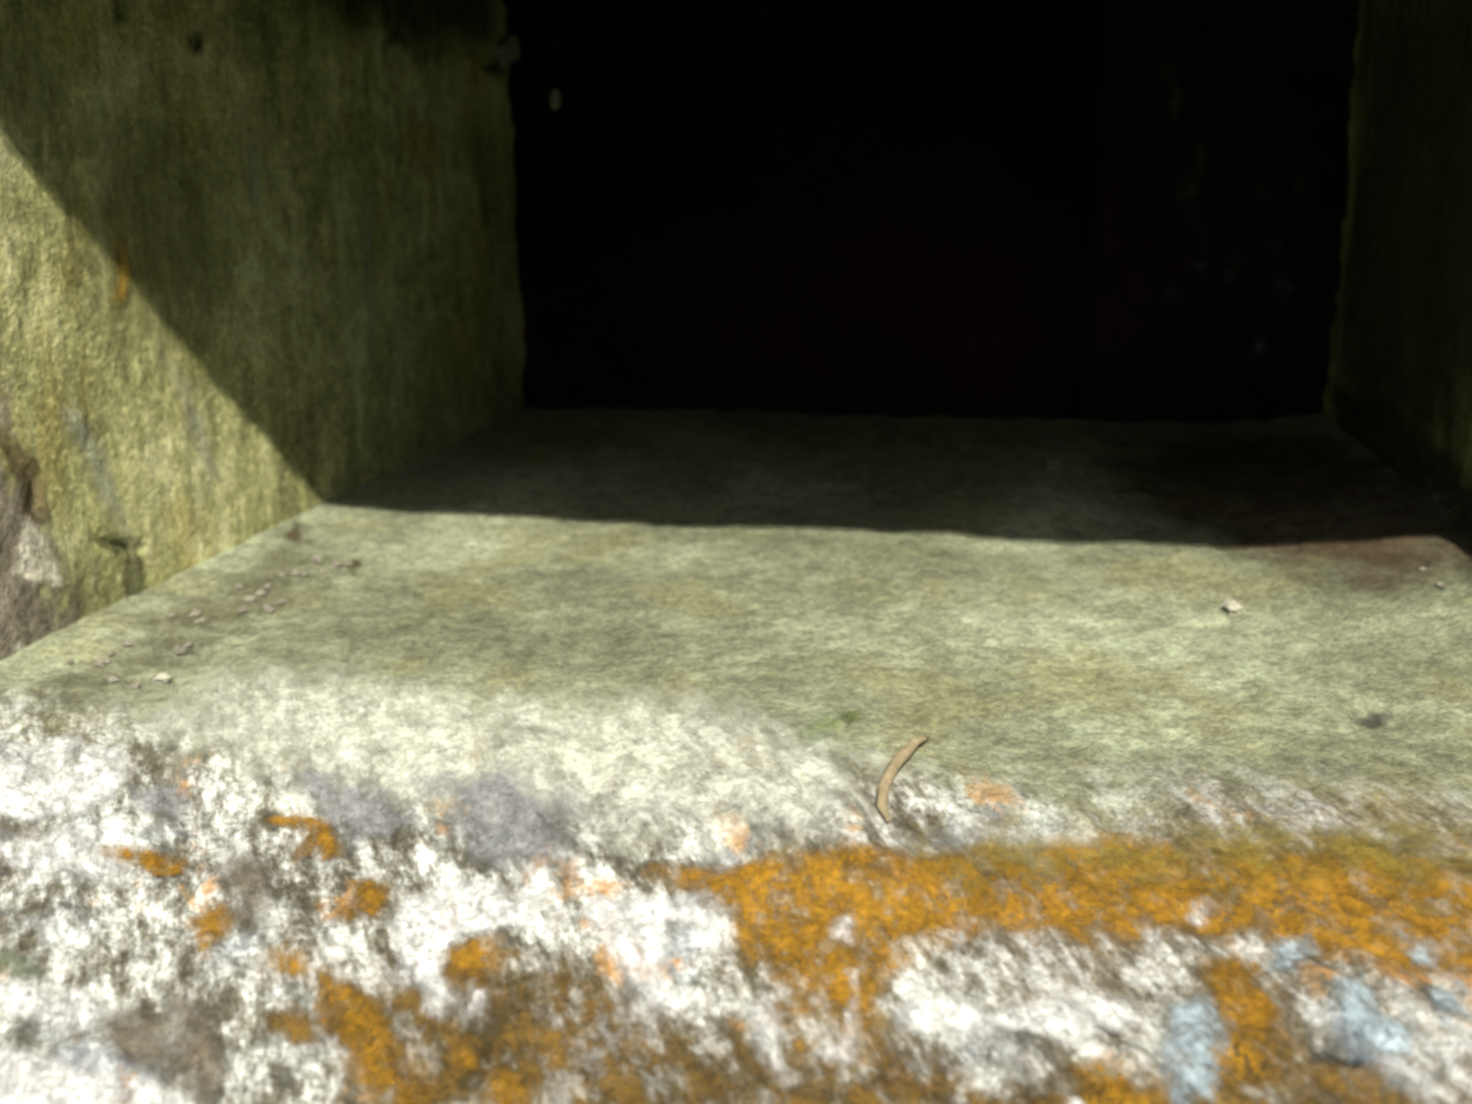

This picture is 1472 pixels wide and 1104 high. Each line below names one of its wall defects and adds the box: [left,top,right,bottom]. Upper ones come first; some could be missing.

water stain [1333,0,1472,524]